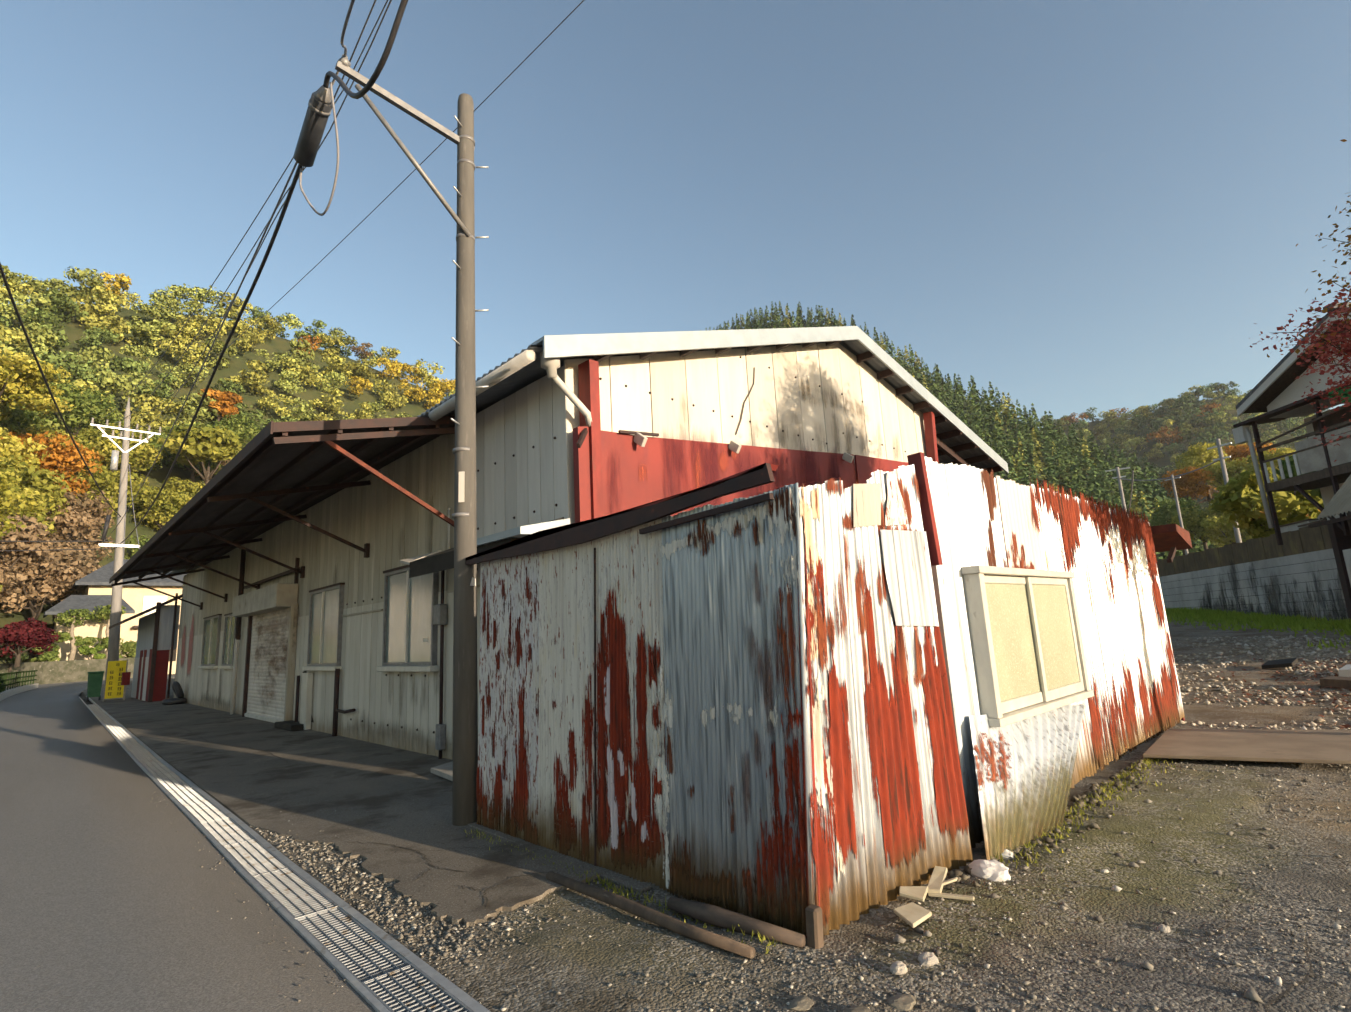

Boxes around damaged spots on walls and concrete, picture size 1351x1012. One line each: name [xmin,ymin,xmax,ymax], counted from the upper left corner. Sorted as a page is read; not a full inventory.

rust [476,567,557,845]
rust [551,472,1013,935]
rust [980,467,1180,771]
crack [345,841,548,906]